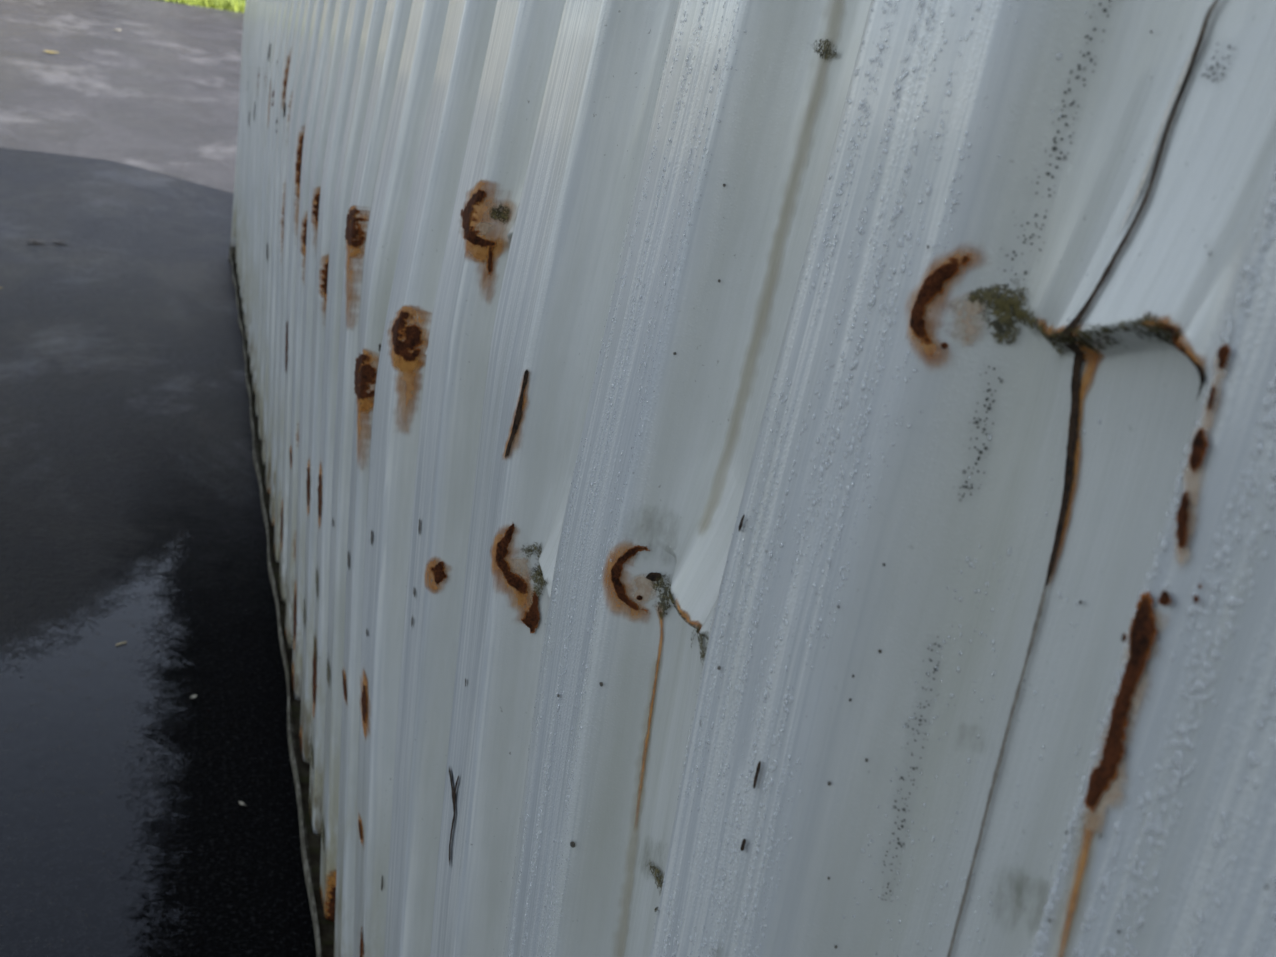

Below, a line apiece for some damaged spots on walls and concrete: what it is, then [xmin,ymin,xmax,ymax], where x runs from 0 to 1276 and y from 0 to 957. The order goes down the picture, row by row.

corrosion [344,205,369,307]
corrosion [354,306,428,449]
corrosion [460,180,510,283]
corrosion [909,250,983,362]
crack [947,0,1219,957]
corrosion [1176,344,1231,563]
corrosion [491,524,540,634]
corrosion [604,545,663,811]
corrosion [1060,591,1171,955]